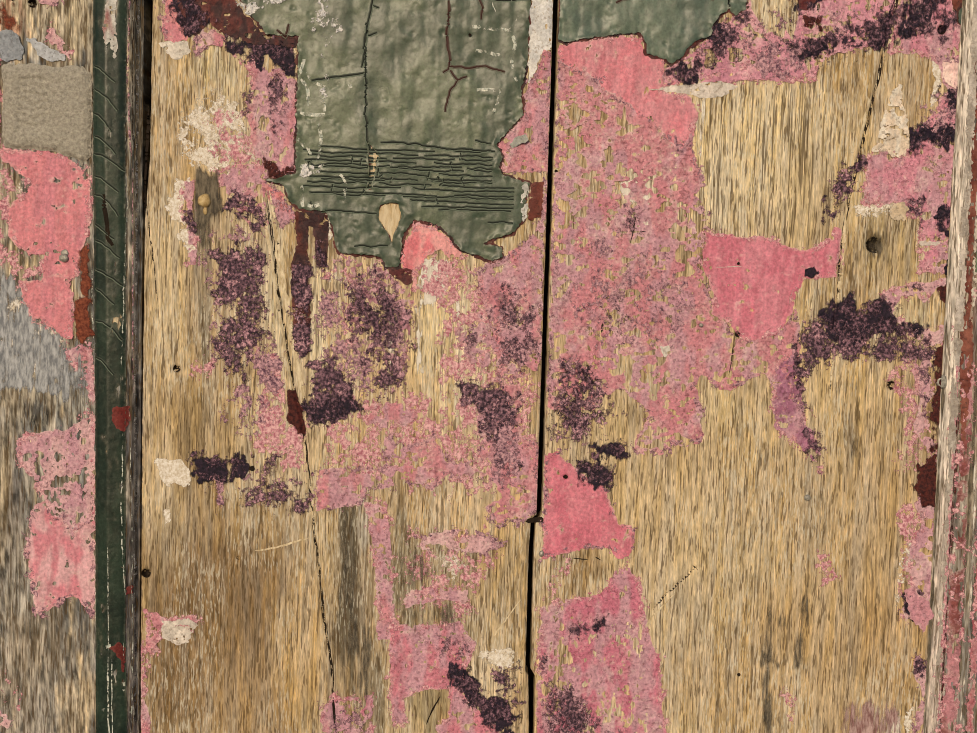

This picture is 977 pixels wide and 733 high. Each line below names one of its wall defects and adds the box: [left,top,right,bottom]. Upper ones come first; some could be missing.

crack [276,24,290,39]
crack [297,0,514,225]
crack [442,0,529,113]
peeling [0,0,134,733]
crack [265,188,296,390]
crack [354,242,388,250]
peeling [155,0,669,733]
peeling [546,0,962,481]
peeling [899,92,977,733]
peeling [141,608,204,733]
crack [302,423,337,733]